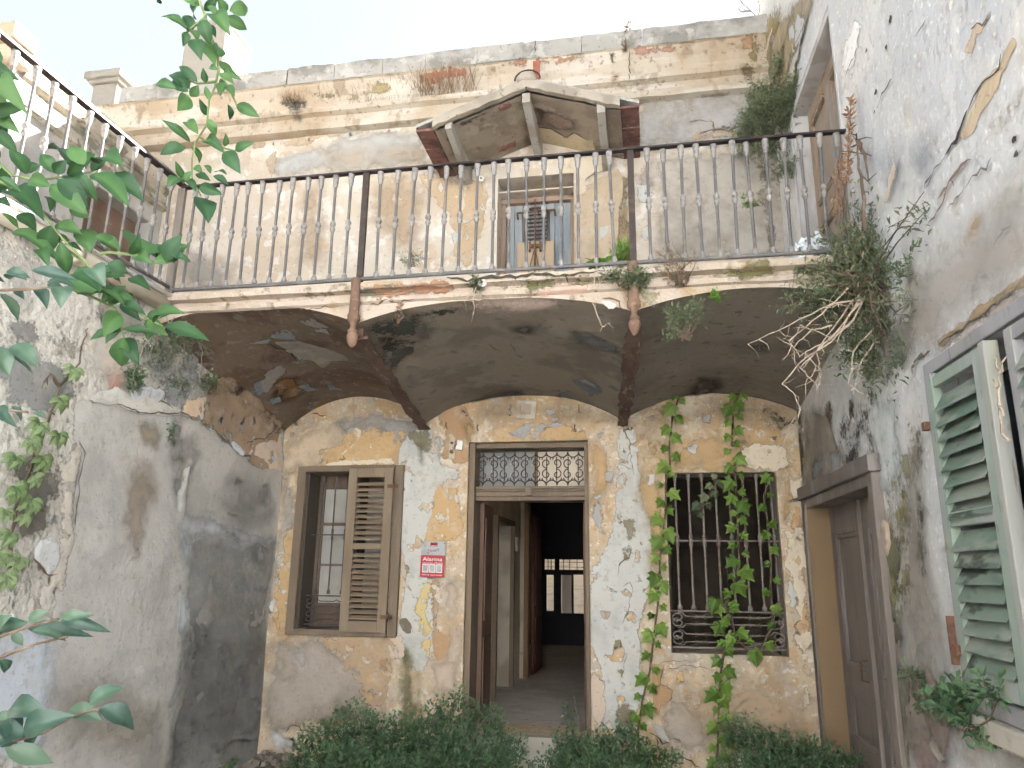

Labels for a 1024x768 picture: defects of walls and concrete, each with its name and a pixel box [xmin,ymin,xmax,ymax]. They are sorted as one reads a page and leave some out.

spalling [925,38,1016,188]
crack [924,158,991,223]
peeling [200,318,375,471]
peeling [320,428,395,466]
peeling [741,436,812,669]
damp [888,424,931,664]
spalling [418,579,452,660]
damp [182,637,263,739]
damp [905,679,939,748]